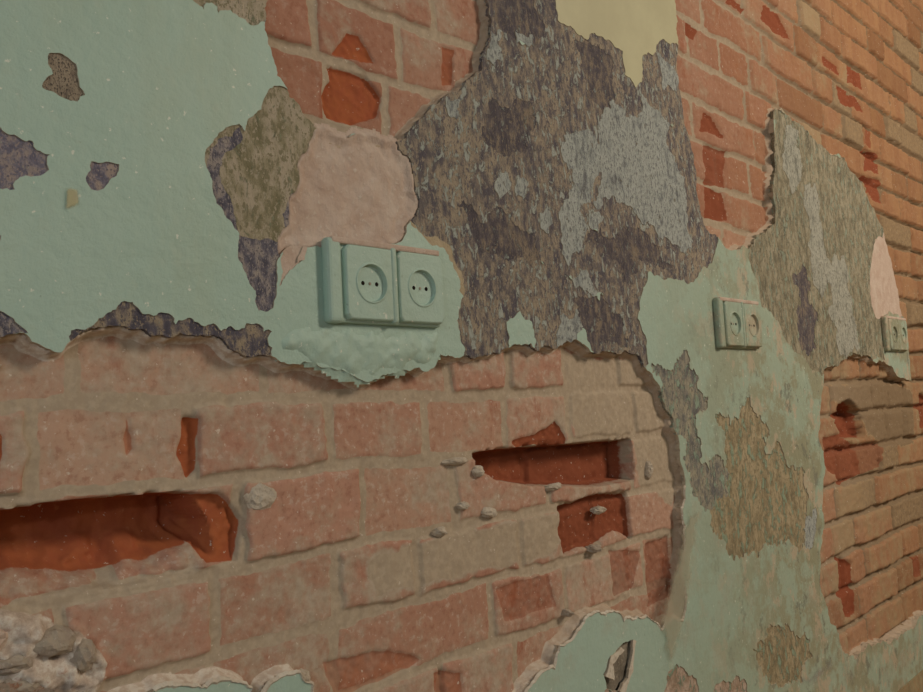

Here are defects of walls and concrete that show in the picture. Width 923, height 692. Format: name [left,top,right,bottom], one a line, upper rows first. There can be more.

peeling [42,53,84,101]
peeling [0,129,49,190]
peeling [86,162,119,191]
flaking render [193,0,923,656]
flaking render [0,301,817,692]